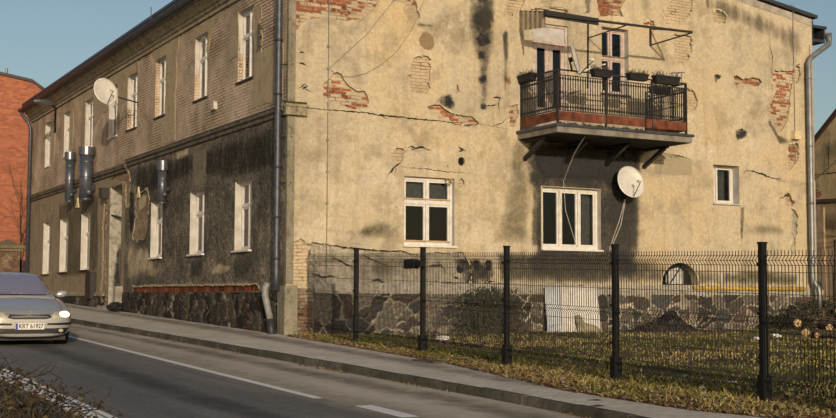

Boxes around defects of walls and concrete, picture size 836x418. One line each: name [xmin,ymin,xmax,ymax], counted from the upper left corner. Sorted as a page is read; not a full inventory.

flaking render [296,0,381,30]
water stain [419,32,434,50]
water stain [473,0,493,58]
flaking render [597,0,625,17]
flaking render [320,69,371,111]
crack [299,51,508,129]
flaking render [427,102,480,127]
flaking render [733,61,802,132]
crack [388,146,471,175]
crack [744,170,795,205]
flaking render [111,170,260,292]
flaking render [292,237,473,288]